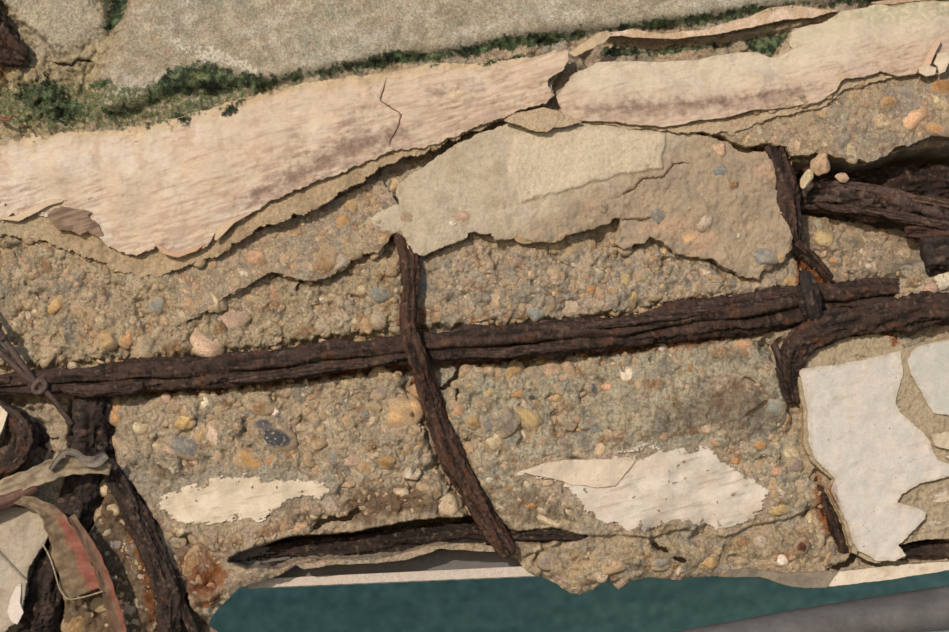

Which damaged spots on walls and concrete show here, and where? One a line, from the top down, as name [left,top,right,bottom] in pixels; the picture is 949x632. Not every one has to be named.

crack [380,81,402,144]
peeling [0,0,949,365]
rust [792,252,826,285]
spalling [0,115,510,525]
rust [294,365,415,385]
rust [455,358,527,366]
rust [577,339,722,358]
spalling [434,163,949,563]
peeling [0,506,49,632]
rust [181,558,226,607]
crack [313,507,368,530]
spalling [537,510,949,588]